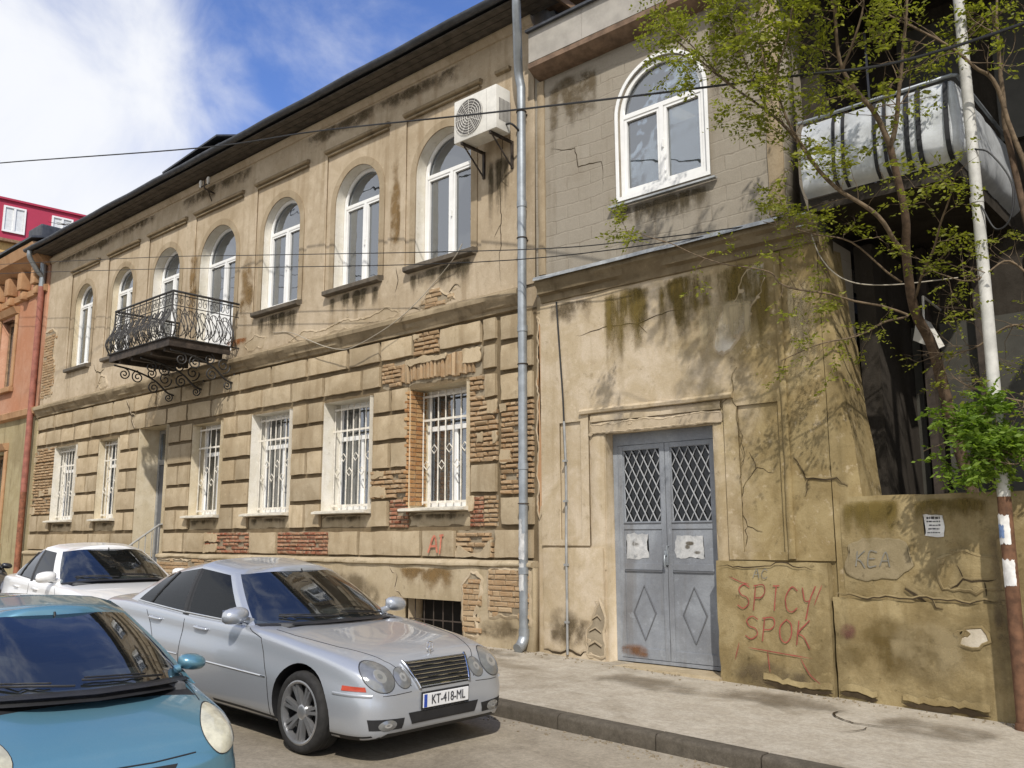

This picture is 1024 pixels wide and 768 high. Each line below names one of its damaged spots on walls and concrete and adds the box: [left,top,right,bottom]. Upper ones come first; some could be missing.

water stain [489,159,508,188]
water stain [241,268,252,304]
water stain [605,288,646,347]
flaking render [40,328,58,401]
flaking render [455,316,542,640]
crack [720,367,817,571]
crack [793,456,848,496]
flaking render [157,532,250,575]
flaking render [277,531,329,555]
crack [838,565,999,610]
flaking render [954,625,992,651]